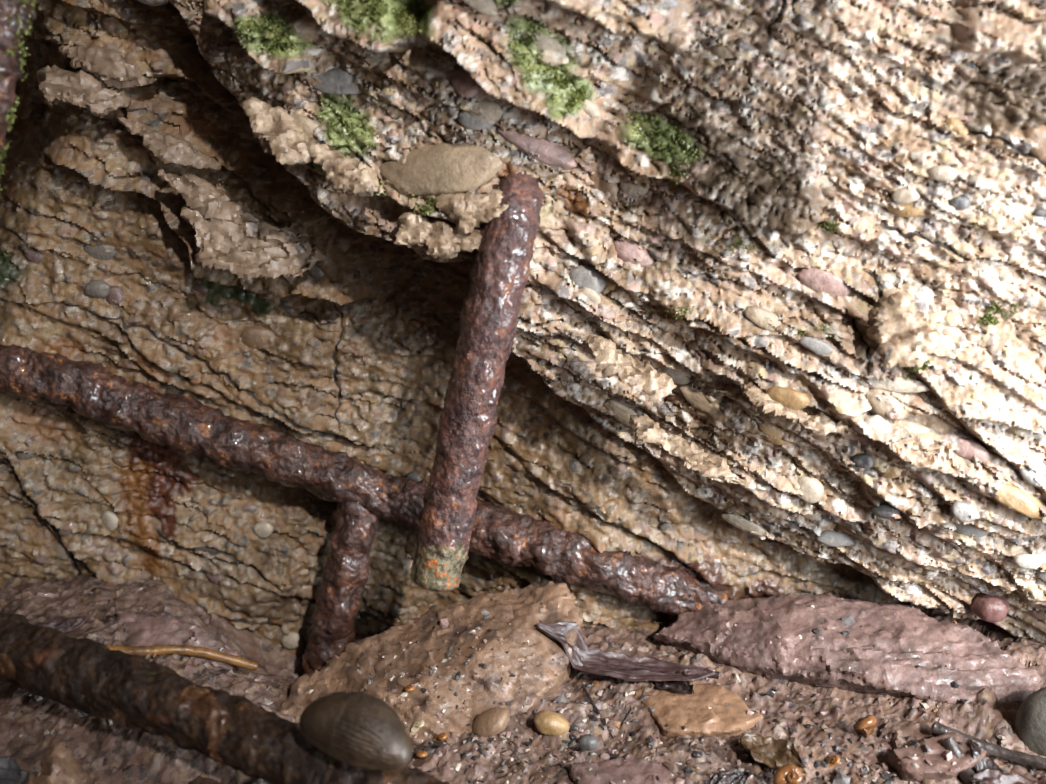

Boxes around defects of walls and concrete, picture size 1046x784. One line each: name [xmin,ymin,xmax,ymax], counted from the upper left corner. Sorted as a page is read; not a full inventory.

spalling [394,189,509,262]
rust [496,162,529,179]
rust [555,185,591,217]
rust [36,335,89,360]
crack [65,301,393,448]
spalling [580,334,750,488]
spalling [740,382,857,437]
crack [0,458,97,578]
rust [121,432,199,576]
crack [157,532,293,593]
crack [223,617,274,626]